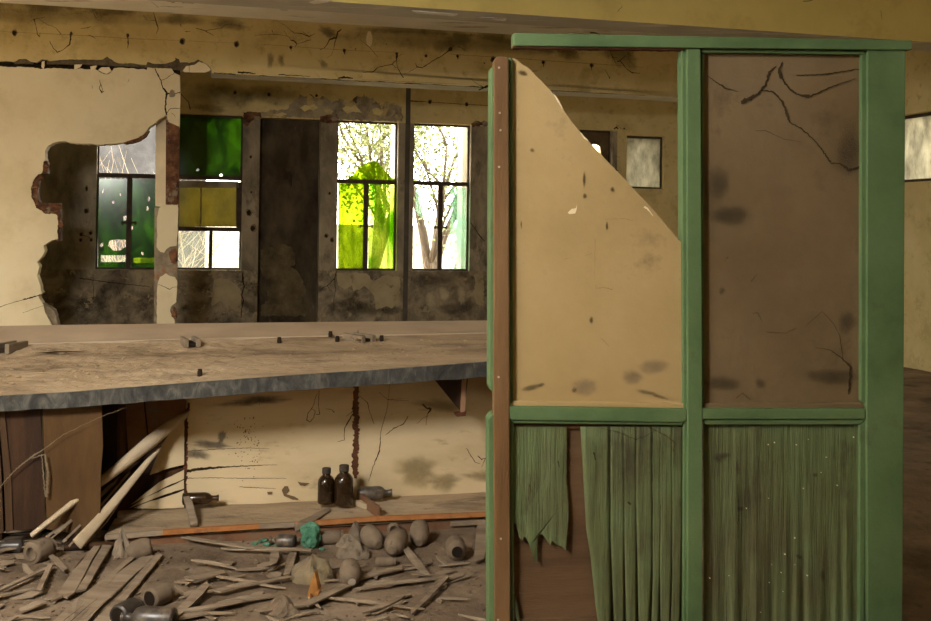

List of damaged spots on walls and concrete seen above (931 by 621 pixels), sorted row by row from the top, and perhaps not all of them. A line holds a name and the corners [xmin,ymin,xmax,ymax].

crack [0,13,240,116]
spalling [123,129,150,145]
spalling [31,161,63,241]
peeling [156,205,178,253]
spalling [43,302,61,325]
peeling [157,274,177,324]
peeling [337,272,400,310]
crack [338,385,408,479]